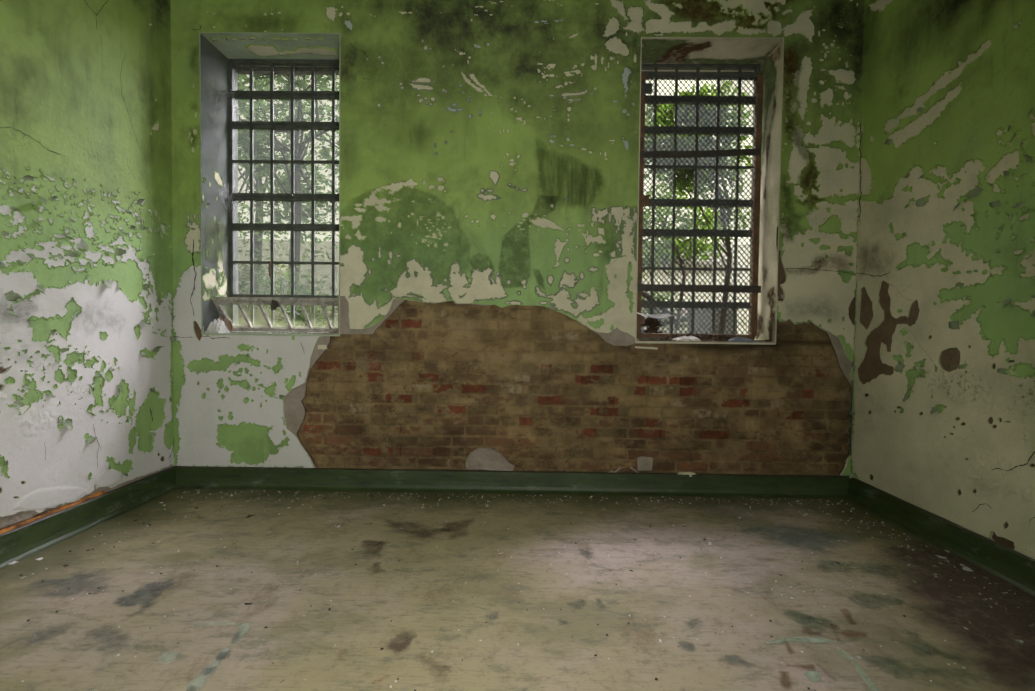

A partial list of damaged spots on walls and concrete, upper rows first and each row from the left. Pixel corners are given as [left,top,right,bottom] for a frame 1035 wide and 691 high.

peeling [206,1,357,56]
peeling [533,0,827,124]
spalling [0,35,1035,559]